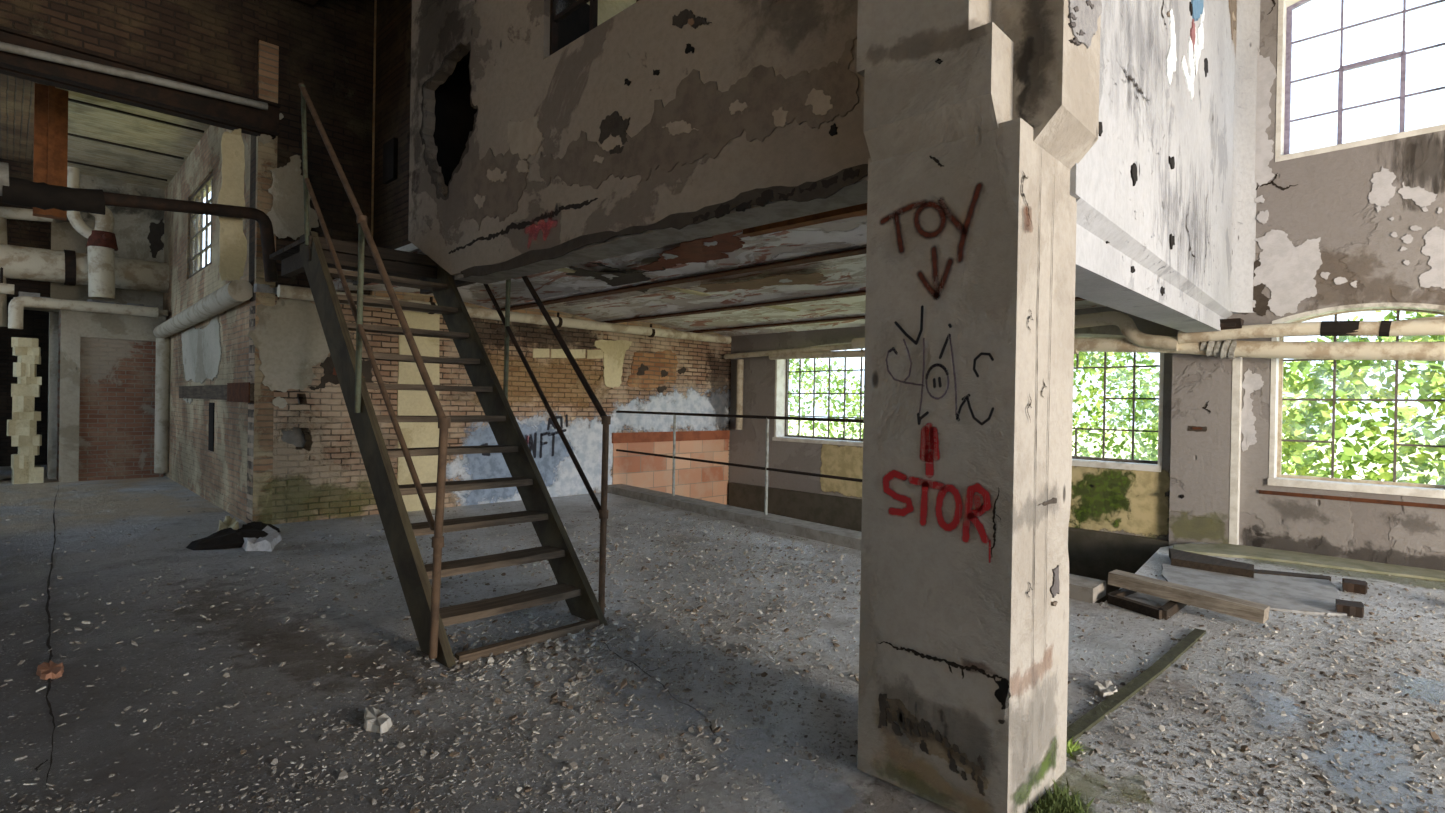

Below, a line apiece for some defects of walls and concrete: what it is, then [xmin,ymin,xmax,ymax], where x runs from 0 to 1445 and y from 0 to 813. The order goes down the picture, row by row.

crack [449,198,598,254]
peeling [461,35,859,231]
spalling [461,164,868,293]
crack [1022,157,1055,454]
peeling [1242,45,1357,316]
peeling [1368,166,1445,289]
crack [35,485,63,786]
crack [879,641,1008,684]
crack [991,488,1001,557]
crack [1027,492,1048,673]